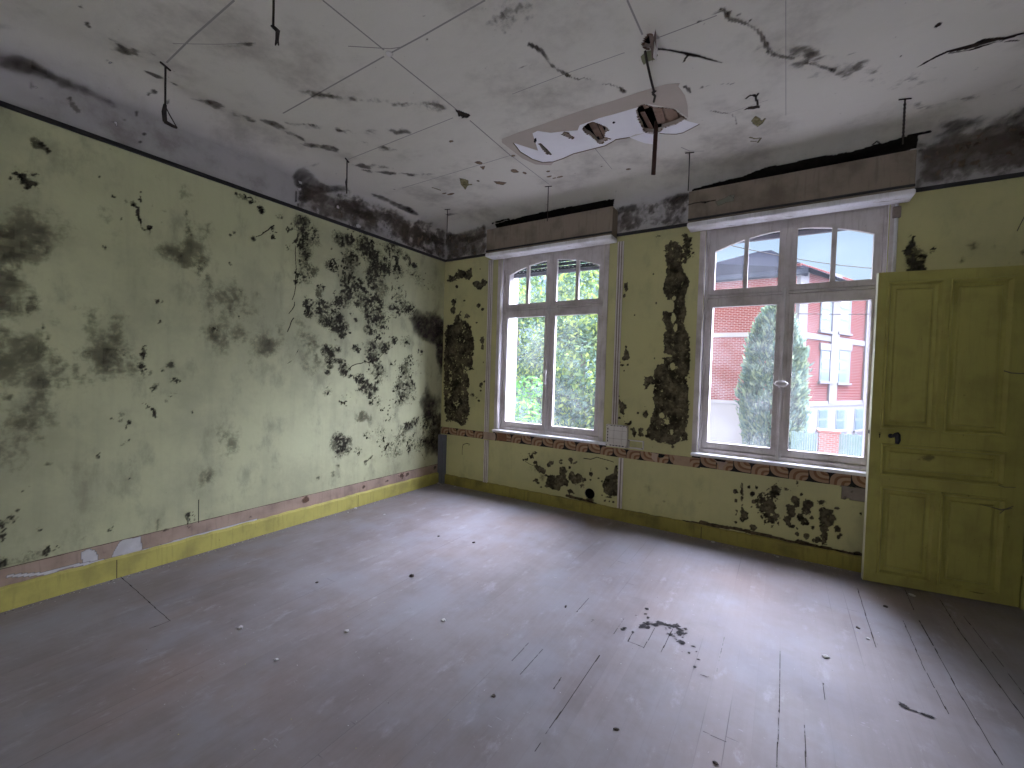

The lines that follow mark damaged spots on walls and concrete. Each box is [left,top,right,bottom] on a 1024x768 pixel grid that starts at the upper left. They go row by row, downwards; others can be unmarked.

peeling [494,83,703,185]
water stain [907,109,1024,188]
water stain [0,219,49,312]
water stain [0,334,49,428]
water stain [259,338,275,354]
water stain [271,170,510,456]
peeling [443,311,485,426]
peeling [618,233,694,448]
flaking render [0,464,437,587]
water stain [330,433,372,463]
peeling [565,465,618,504]
spalling [683,520,862,556]